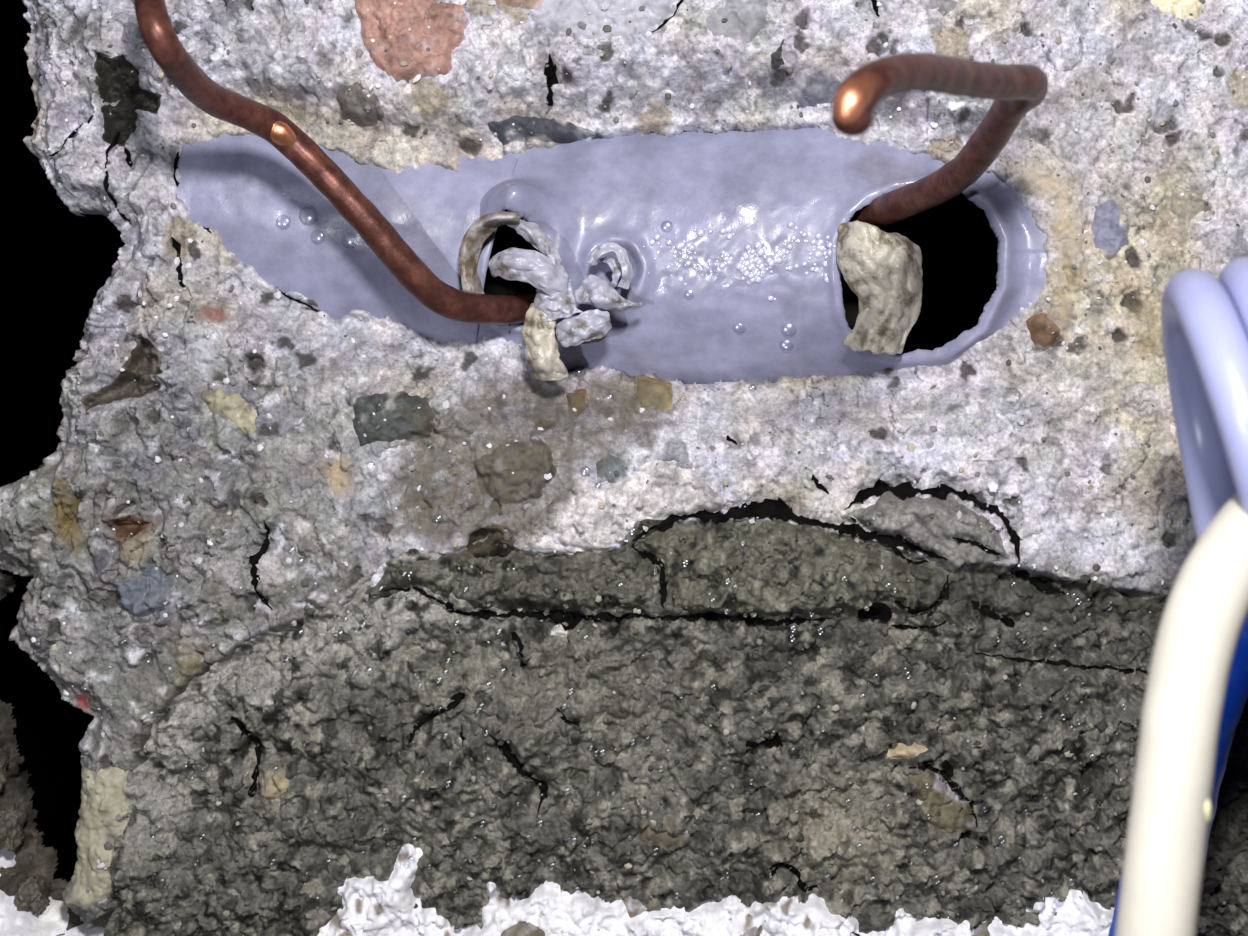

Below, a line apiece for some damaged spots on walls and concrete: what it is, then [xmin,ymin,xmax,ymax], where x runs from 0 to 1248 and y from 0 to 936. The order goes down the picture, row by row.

crack [652,0,684,32]
spalling [0,0,125,487]
crack [49,115,133,224]
spalling [889,194,998,354]
crack [249,520,273,610]
leakage [384,376,662,571]
crack [380,474,1149,674]
spalling [853,491,1010,573]
spalling [0,569,94,884]
leakage [103,519,1172,936]
leakage [1196,698,1248,936]